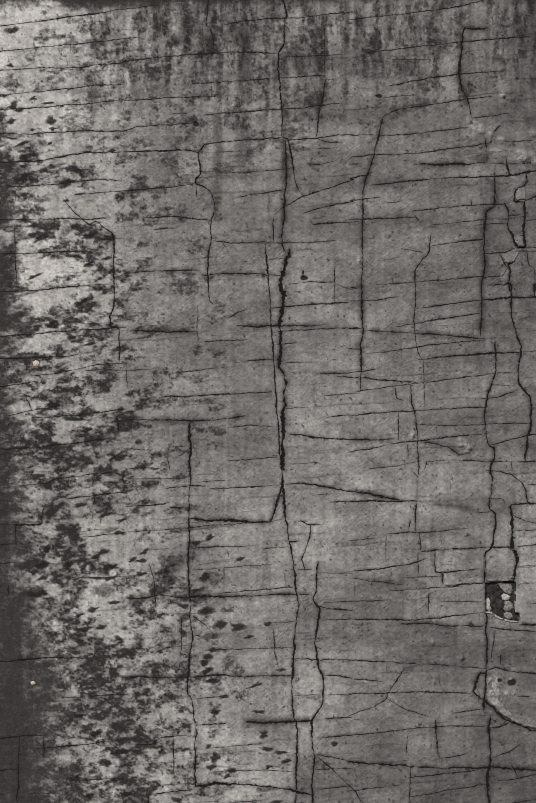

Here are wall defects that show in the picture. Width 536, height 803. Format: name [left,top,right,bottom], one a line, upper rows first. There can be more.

water stain [0,0,46,14]
crack [0,0,269,71]
crack [2,84,123,95]
crack [0,96,216,110]
crack [33,113,188,134]
water stain [27,0,458,152]
crack [2,152,116,163]
crack [0,204,249,397]
crack [0,399,124,459]
water stain [0,63,262,803]
peeling [436,548,520,622]
water stain [260,731,291,763]